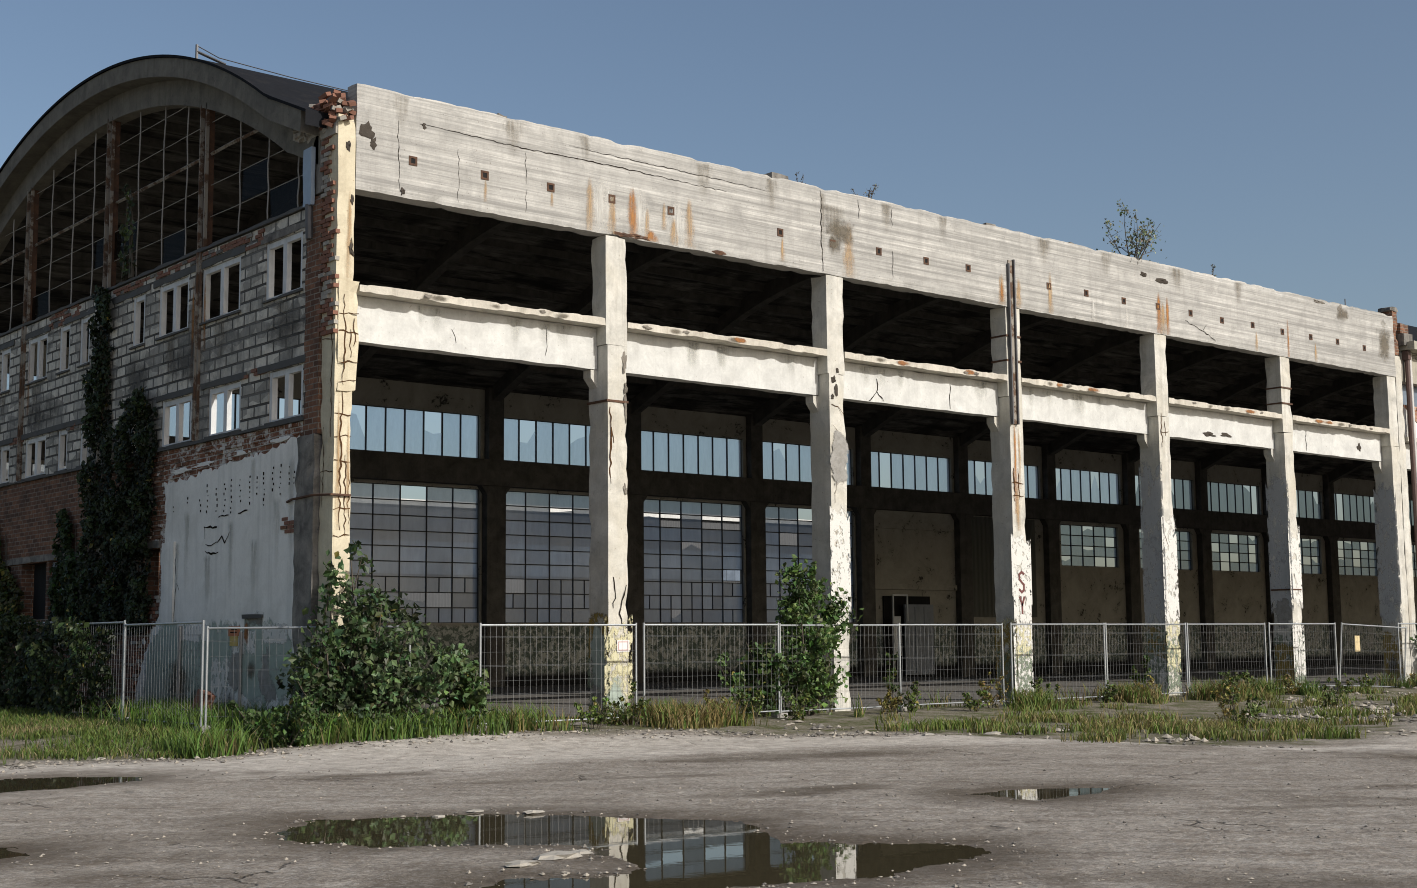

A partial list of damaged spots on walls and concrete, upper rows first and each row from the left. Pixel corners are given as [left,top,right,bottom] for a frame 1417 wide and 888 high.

rust [611,193,692,240]
rust [1157,297,1169,328]